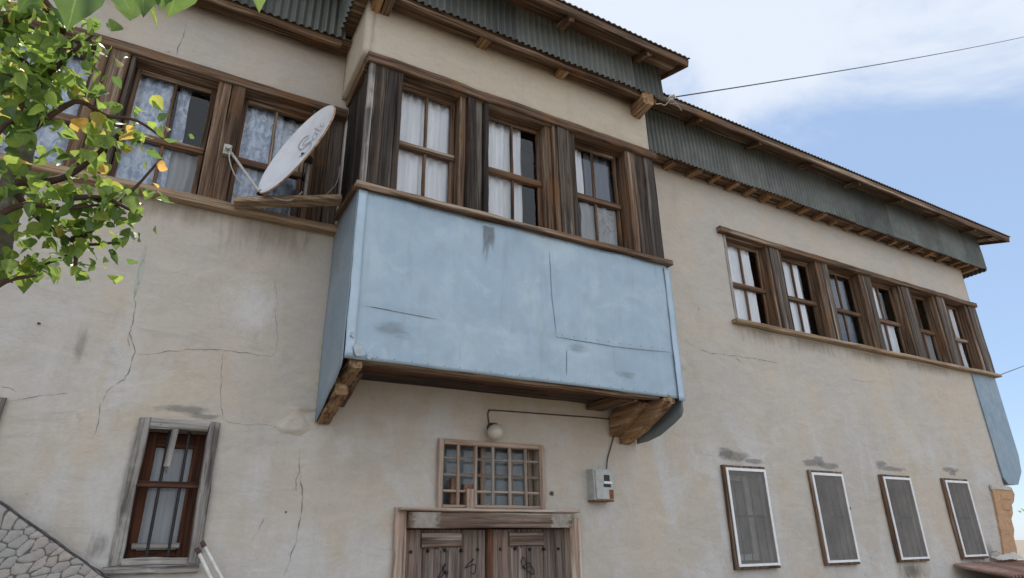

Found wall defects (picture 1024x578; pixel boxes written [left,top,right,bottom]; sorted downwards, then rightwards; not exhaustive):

crack [96,259,278,430]
crack [284,465,303,575]